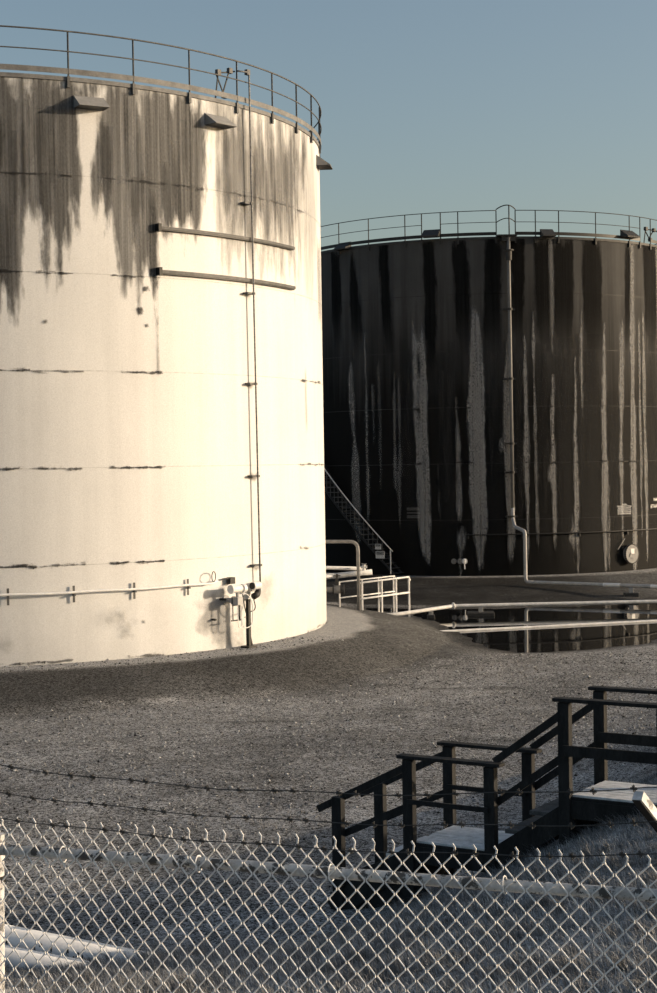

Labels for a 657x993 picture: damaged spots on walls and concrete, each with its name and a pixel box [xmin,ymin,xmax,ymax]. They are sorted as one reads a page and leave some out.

water stain [0,76,205,312]
water stain [217,103,305,245]
water stain [331,252,362,333]
water stain [379,245,391,332]
water stain [423,242,437,361]
water stain [452,240,470,328]
water stain [484,239,602,331]
water stain [643,245,657,327]